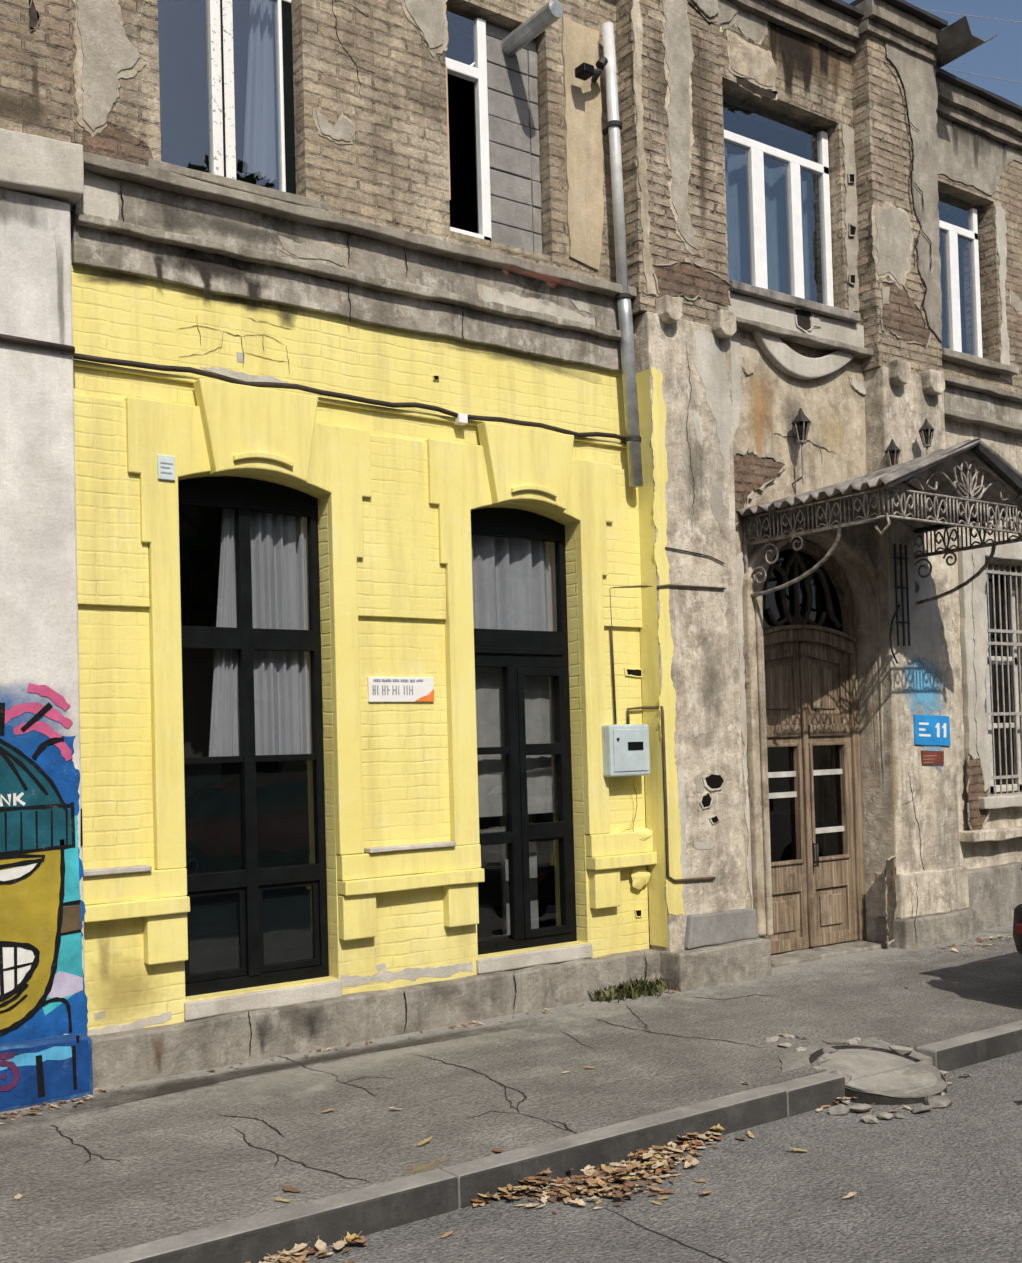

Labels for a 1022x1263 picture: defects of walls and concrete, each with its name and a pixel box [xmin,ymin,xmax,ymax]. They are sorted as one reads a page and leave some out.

spalling [28,0,41,32]
flaking render [72,0,153,165]
leakage [768,22,838,95]
peeling [82,171,119,220]
leakage [164,209,277,240]
flaking render [630,0,778,306]
crack [884,43,932,329]
flaking render [841,41,1022,383]
leakage [155,247,292,323]
crack [179,318,290,374]
peeling [693,328,786,528]
peeling [340,961,473,987]